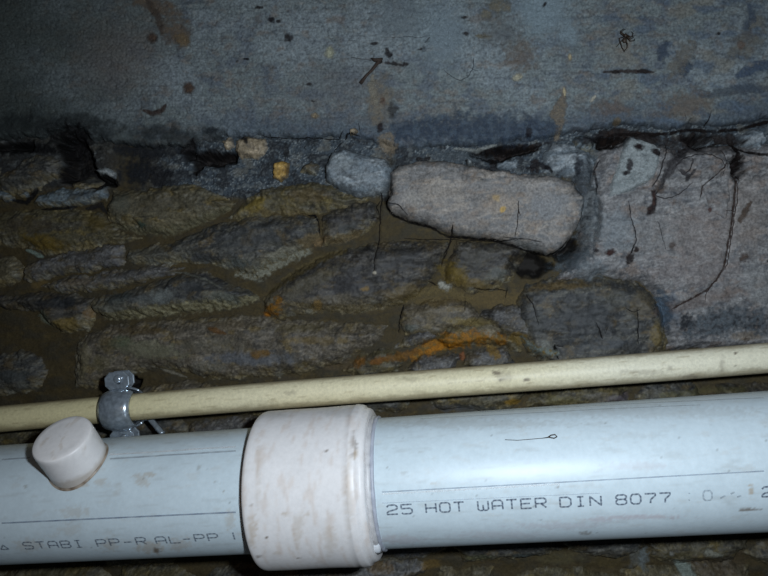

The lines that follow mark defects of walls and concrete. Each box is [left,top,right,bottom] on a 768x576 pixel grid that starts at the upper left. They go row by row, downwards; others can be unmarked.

damp [1,116,101,161]
crack [371,193,588,287]
crack [615,113,768,309]
corrosion [355,330,506,366]